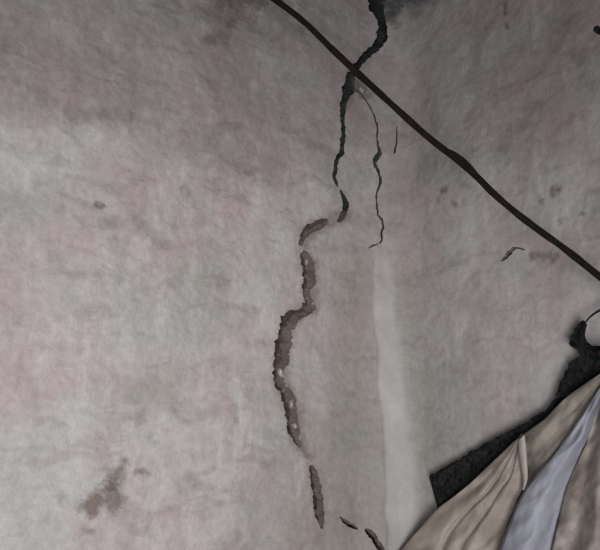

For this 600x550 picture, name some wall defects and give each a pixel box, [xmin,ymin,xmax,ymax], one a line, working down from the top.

crack [272,0,398,448]
crack [309,465,385,550]